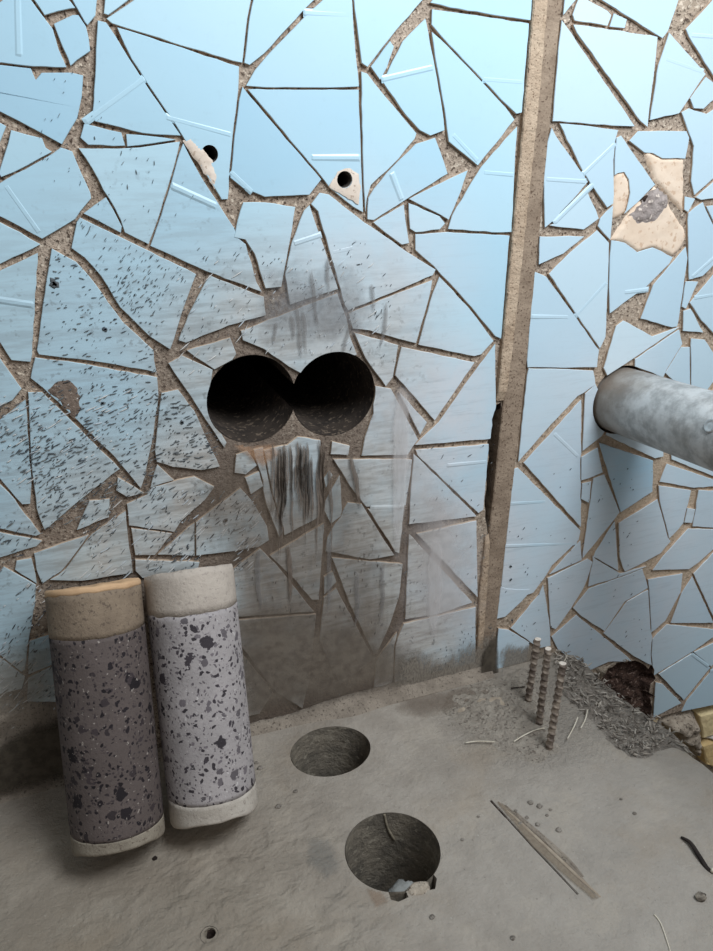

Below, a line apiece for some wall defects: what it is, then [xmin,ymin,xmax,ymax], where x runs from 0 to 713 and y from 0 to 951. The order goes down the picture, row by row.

spalling [610,153,685,256]
damp [270,442,333,600]
damp [350,454,360,506]
spalling [594,658,655,716]